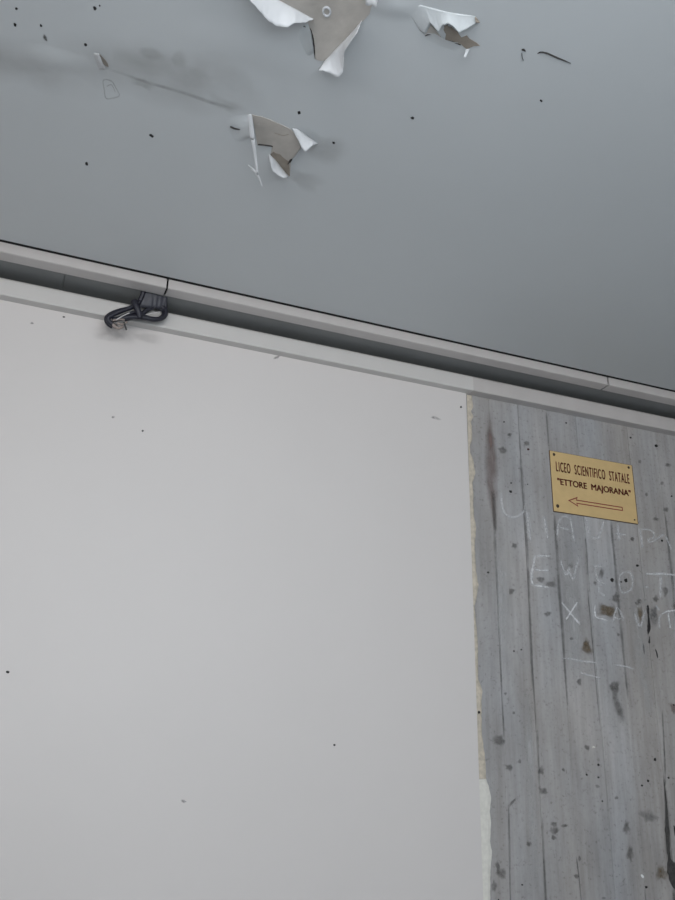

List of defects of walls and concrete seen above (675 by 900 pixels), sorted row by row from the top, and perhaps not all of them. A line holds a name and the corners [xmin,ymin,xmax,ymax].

peeling [250,0,378,77]
peeling [412,5,480,58]
peeling [227,114,318,188]